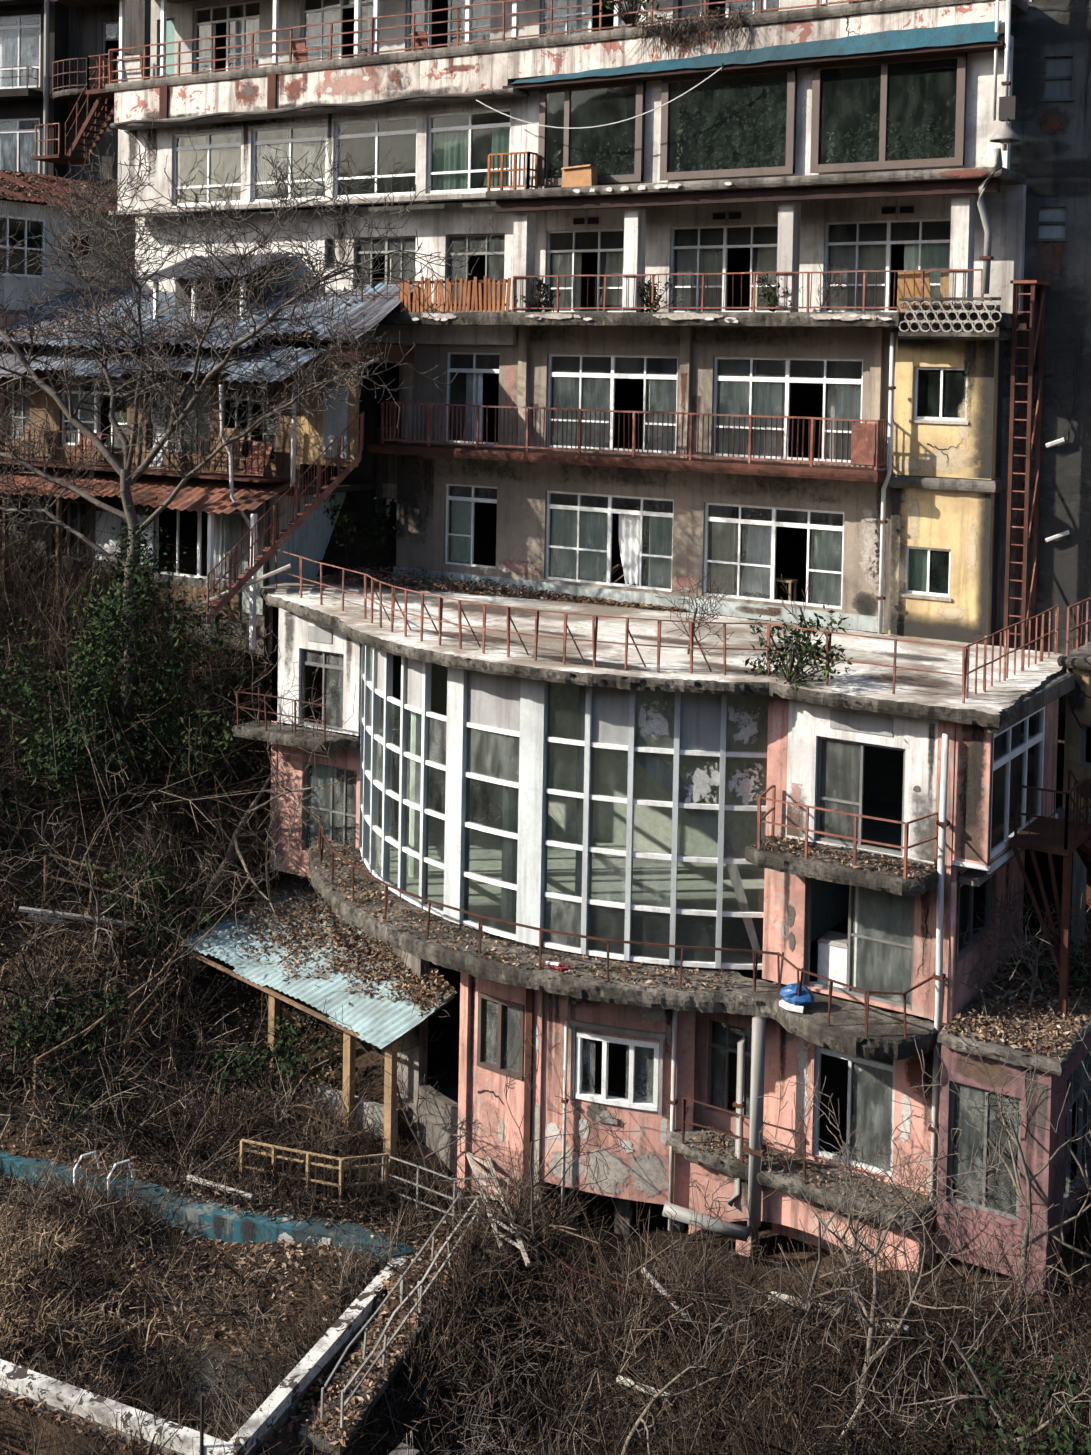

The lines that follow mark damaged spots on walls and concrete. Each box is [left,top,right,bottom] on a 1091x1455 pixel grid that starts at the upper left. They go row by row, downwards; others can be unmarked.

peeling [315,74,379,96]
leakage [1011,0,1091,197]
crack [927,439,963,467]
peeling [535,994,599,1052]
peeling [530,1006,673,1221]